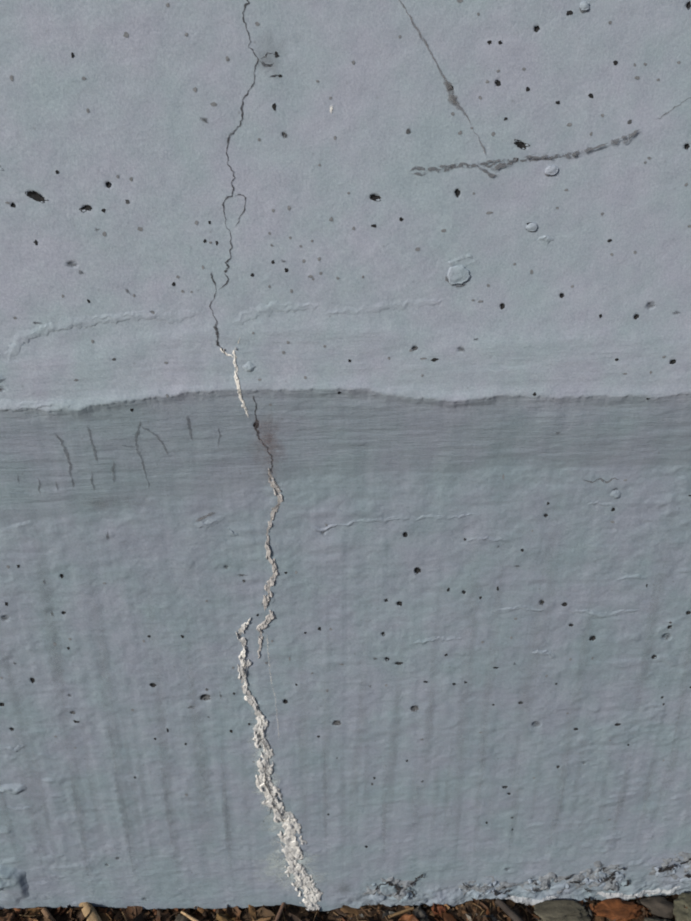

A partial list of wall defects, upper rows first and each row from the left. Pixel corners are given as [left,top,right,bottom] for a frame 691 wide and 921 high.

crack [209,0,323,912]